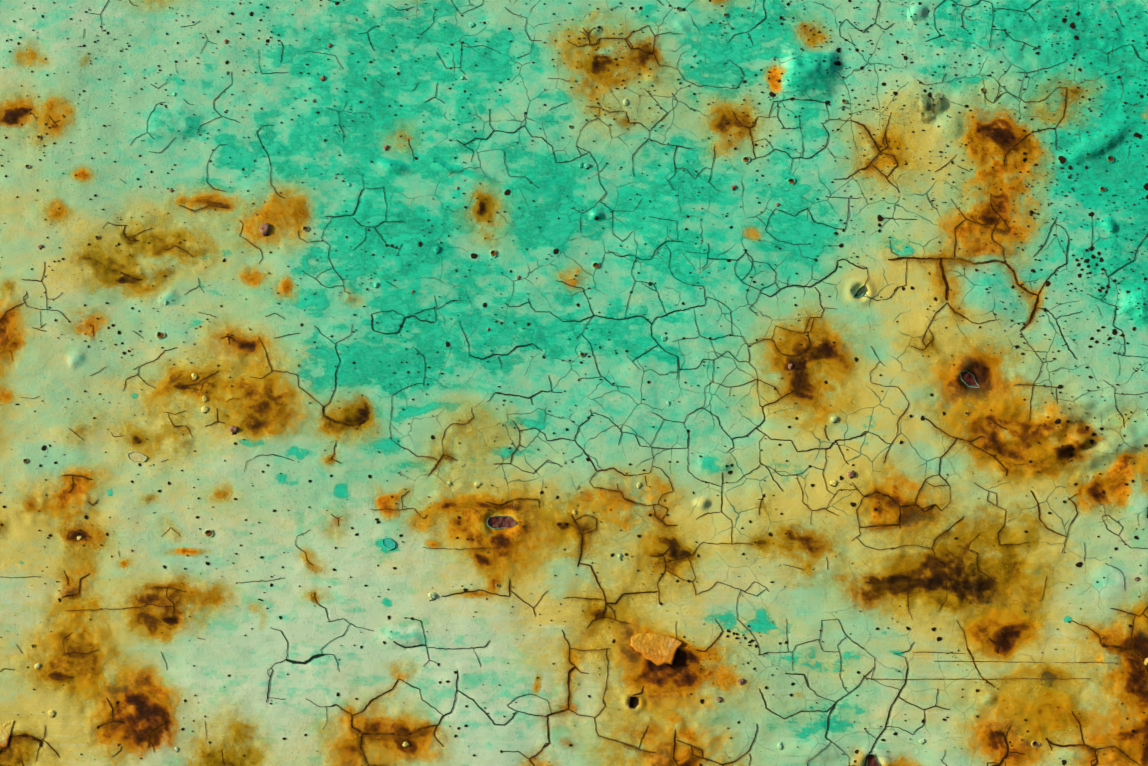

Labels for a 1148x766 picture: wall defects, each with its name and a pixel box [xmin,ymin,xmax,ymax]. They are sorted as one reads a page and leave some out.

crack [130,21,285,263]
crack [251,0,1148,766]
rust [911,338,1148,512]
peeling [0,720,14,748]
crack [0,726,60,766]
rust [23,467,180,765]
crack [2,571,205,680]
peeling [487,516,517,529]
rust [375,478,697,598]
rust [560,594,746,766]
peeling [631,633,682,666]
rust [839,465,1148,766]